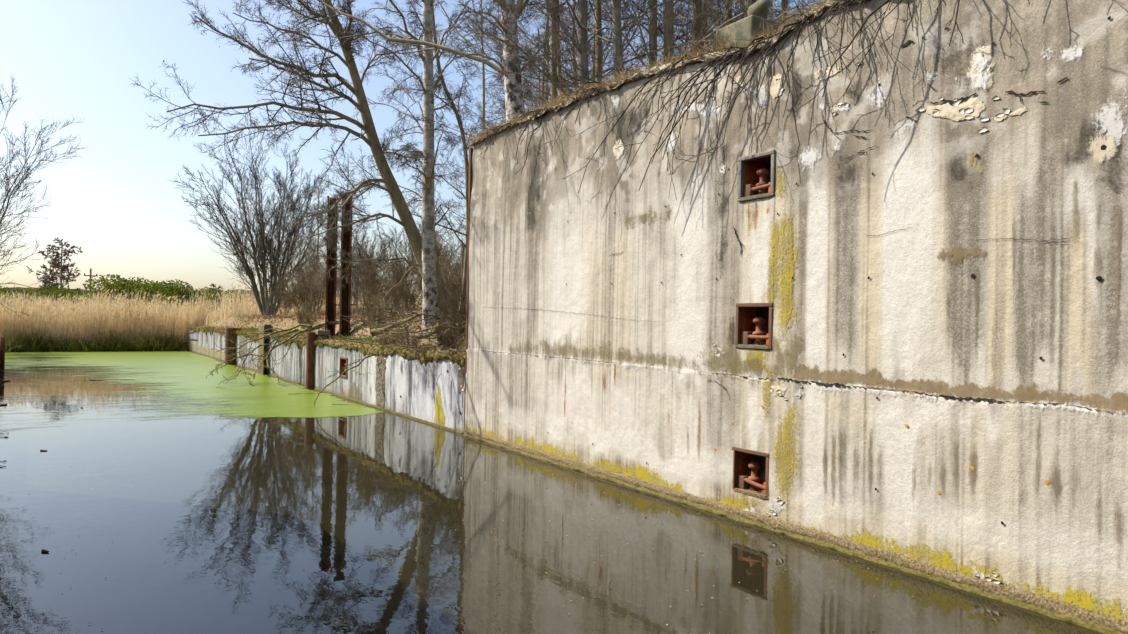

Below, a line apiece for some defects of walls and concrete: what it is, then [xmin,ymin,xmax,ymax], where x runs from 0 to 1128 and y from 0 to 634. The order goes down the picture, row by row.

spalling [915,44,1027,133]
damp [527,142,540,230]
damp [665,128,675,153]
damp [717,146,728,265]
damp [798,140,854,181]
damp [1066,88,1128,193]
spalling [1087,133,1116,164]
damp [498,324,1128,417]
crack [708,373,1128,414]
damp [823,432,880,487]
damp [912,444,976,491]
damp [1036,430,1061,500]